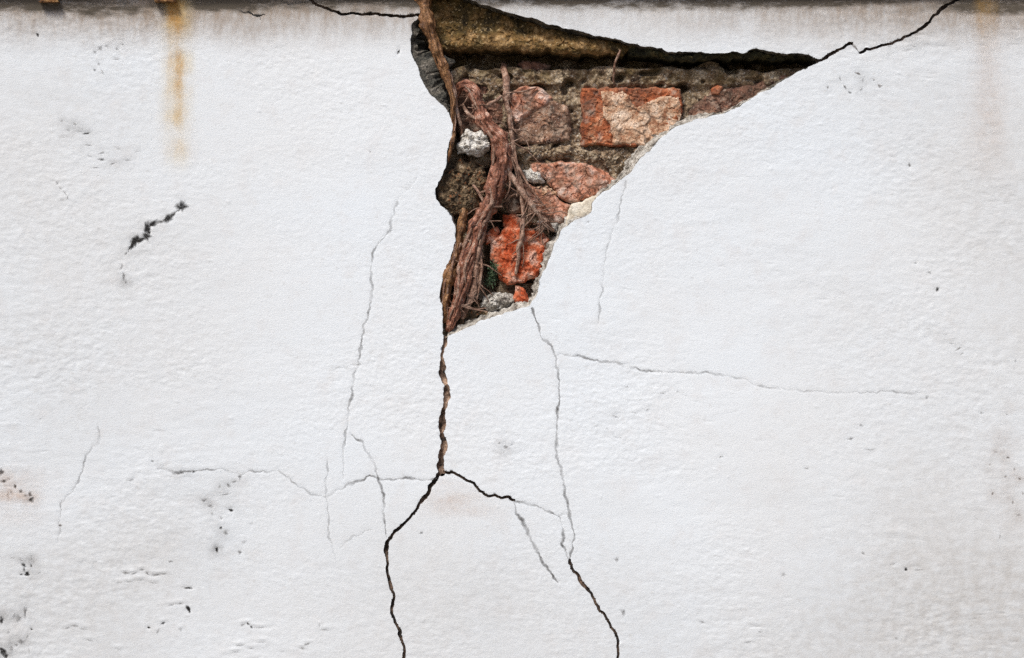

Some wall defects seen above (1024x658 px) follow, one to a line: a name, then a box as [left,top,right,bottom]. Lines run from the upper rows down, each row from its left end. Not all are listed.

crack [240,0,420,18]
crack [815,0,960,63]
spalling [398,0,819,338]
crack [384,336,524,658]
crack [540,540,620,658]